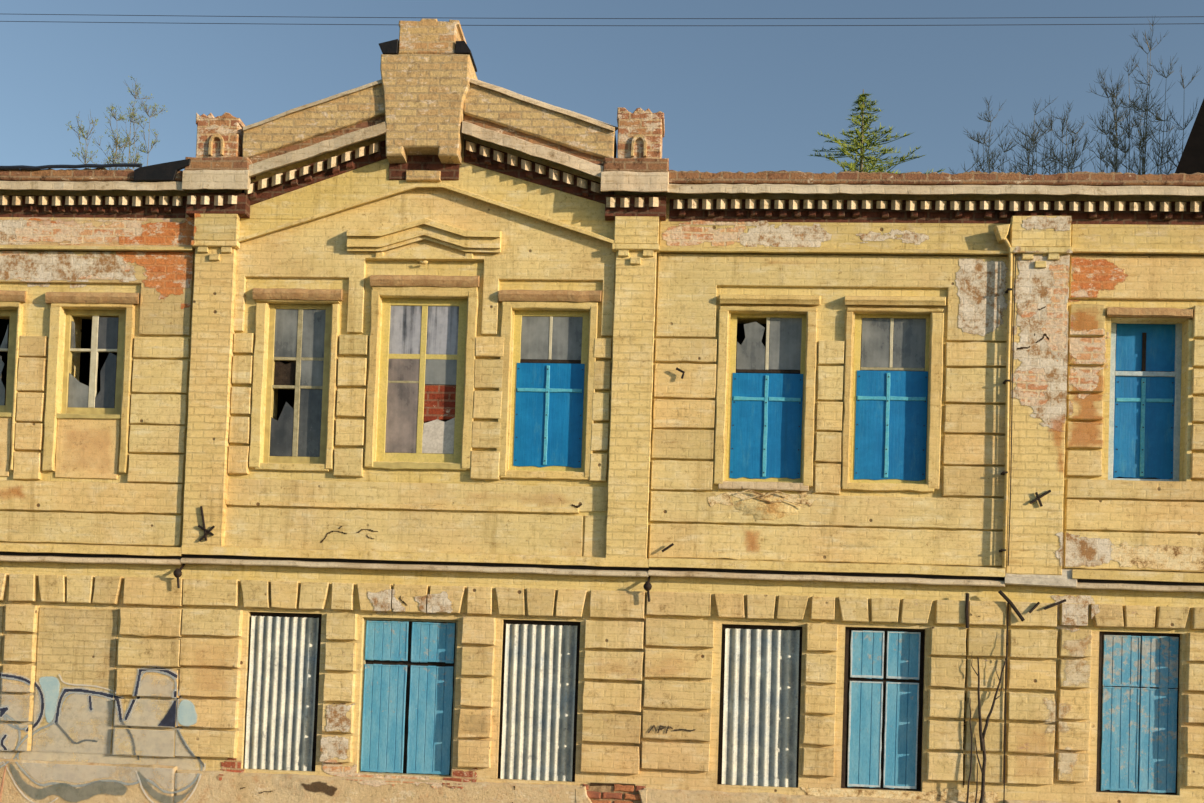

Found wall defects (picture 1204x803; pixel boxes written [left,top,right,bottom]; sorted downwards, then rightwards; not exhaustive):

peeling [662,220,832,247]
peeling [1022,216,1072,231]
peeling [0,213,201,309]
peeling [955,246,1128,432]
flaking render [1055,532,1204,570]
flaking render [367,589,453,614]
flaking render [302,703,478,796]
spalling [575,783,648,803]